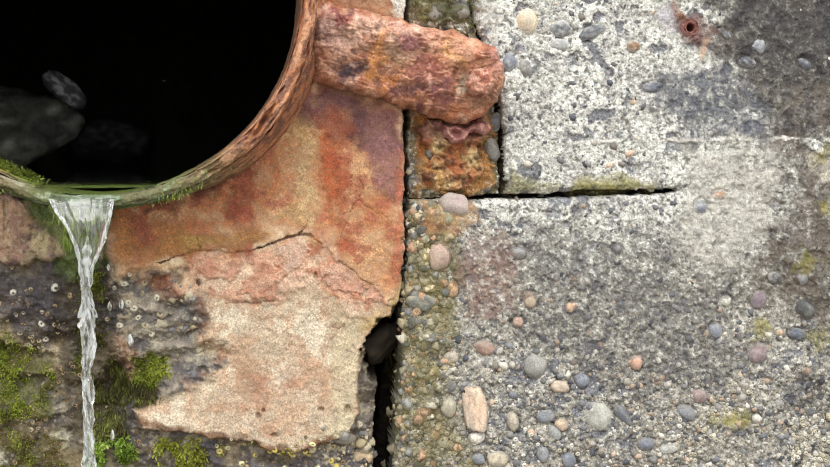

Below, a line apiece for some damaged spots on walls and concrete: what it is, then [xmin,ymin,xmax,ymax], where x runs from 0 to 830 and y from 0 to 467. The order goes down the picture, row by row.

rust [330,0,392,16]
rust [411,110,495,233]
crack [466,97,674,200]
water stain [656,0,830,324]
crack [157,225,322,264]
water stain [0,243,123,432]
crack [386,306,396,324]
water stain [93,402,115,440]
crack [372,348,397,467]